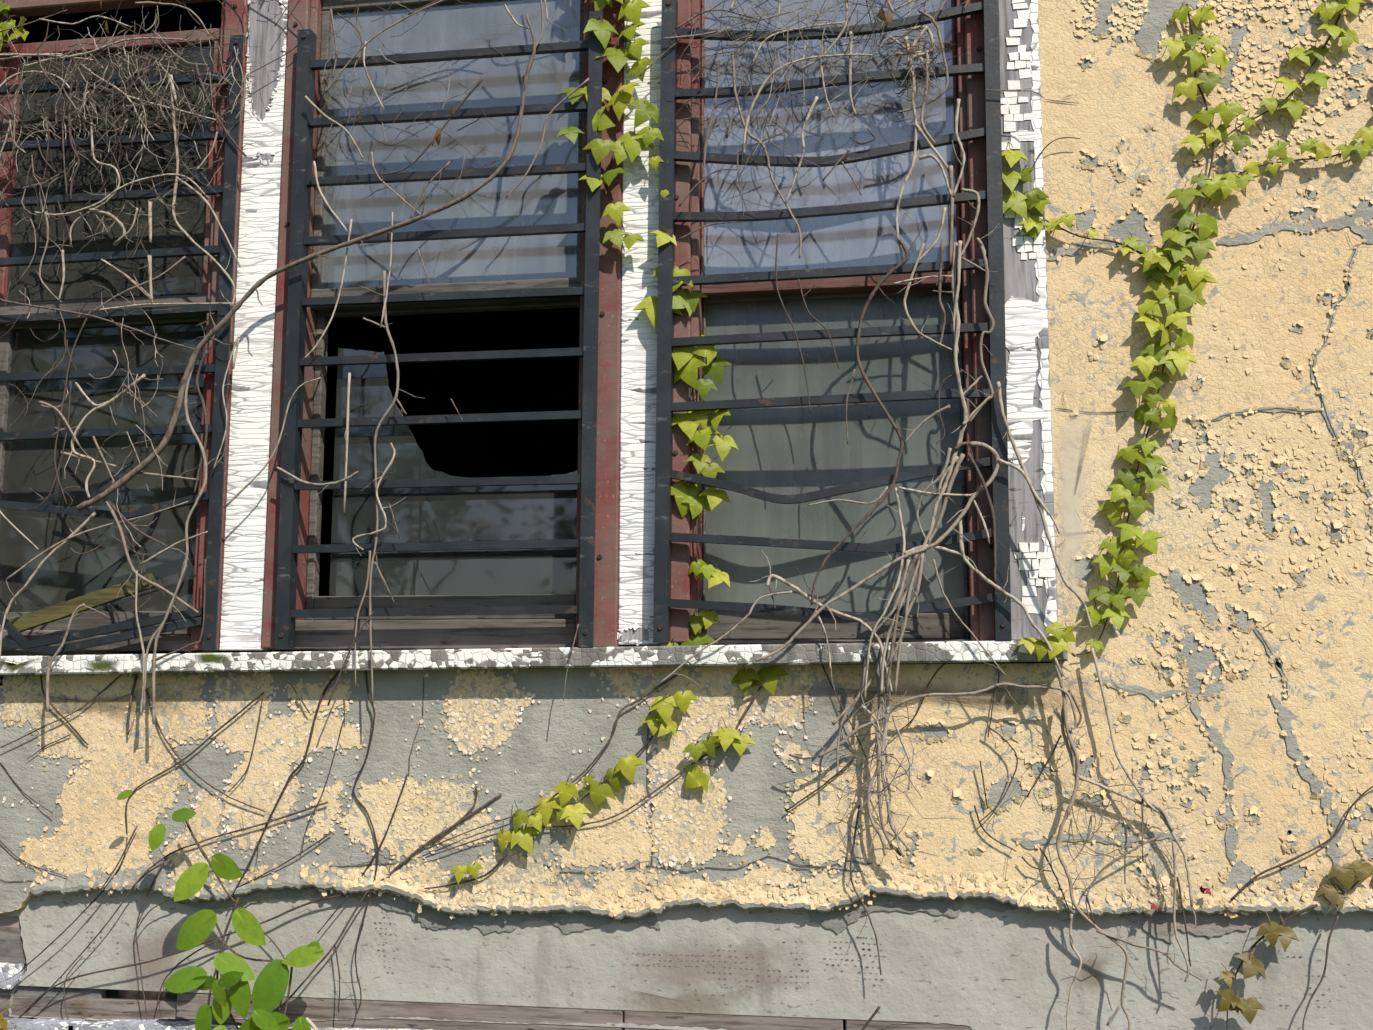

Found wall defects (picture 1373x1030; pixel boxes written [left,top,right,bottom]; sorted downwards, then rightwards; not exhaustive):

peeling [1001,0,1039,150]
peeling [1004,208,1043,260]
crack [1048,237,1155,261]
peeling [1071,137,1159,252]
crack [1056,391,1128,413]
crack [1211,212,1373,504]
peeling [1289,320,1304,333]
peeling [617,623,649,646]
peeling [982,391,1373,943]
peeling [0,665,1018,935]
crack [1094,672,1245,866]
crack [1251,621,1352,884]